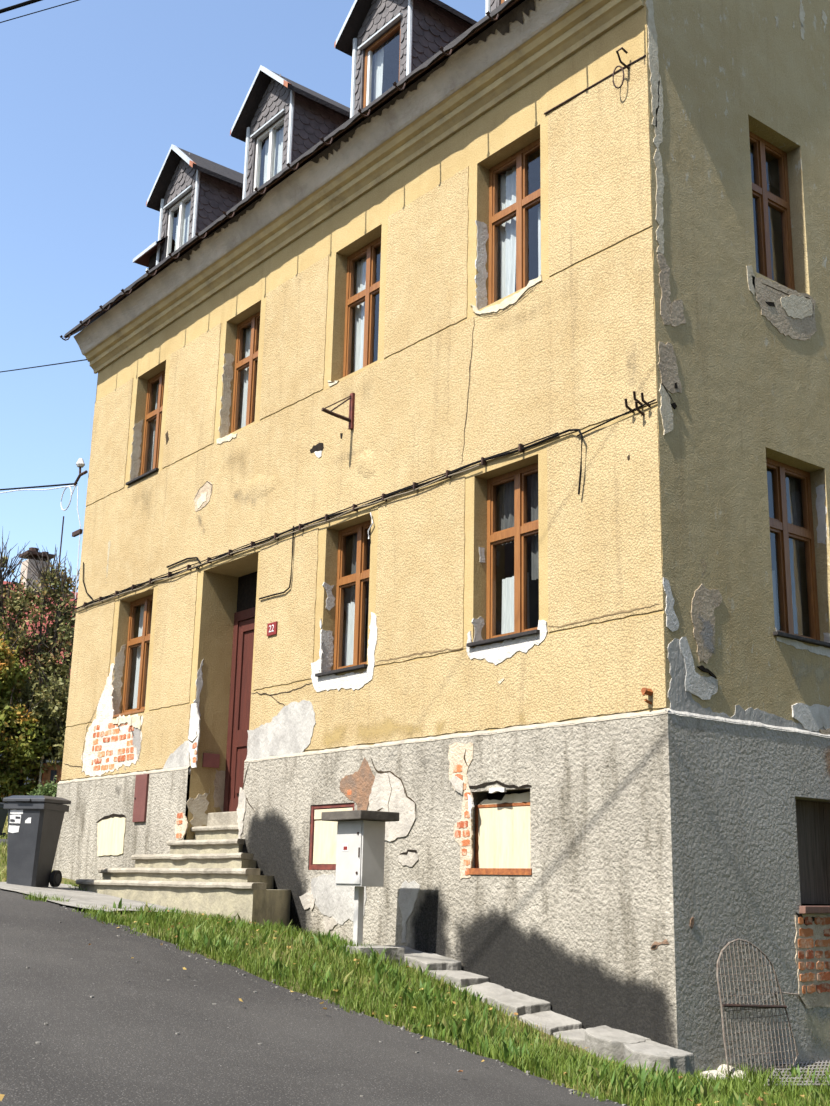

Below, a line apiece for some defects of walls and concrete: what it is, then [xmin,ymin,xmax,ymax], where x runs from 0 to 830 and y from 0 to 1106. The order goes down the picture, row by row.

peeling [645,0,686,327]
flaking render [746,265,817,341]
peeling [658,341,682,435]
peeling [663,577,722,700]
flaking render [81,644,143,777]
peeling [791,703,830,735]
flaking render [340,758,375,810]
flaking render [448,742,474,879]
flaking render [794,914,830,1009]